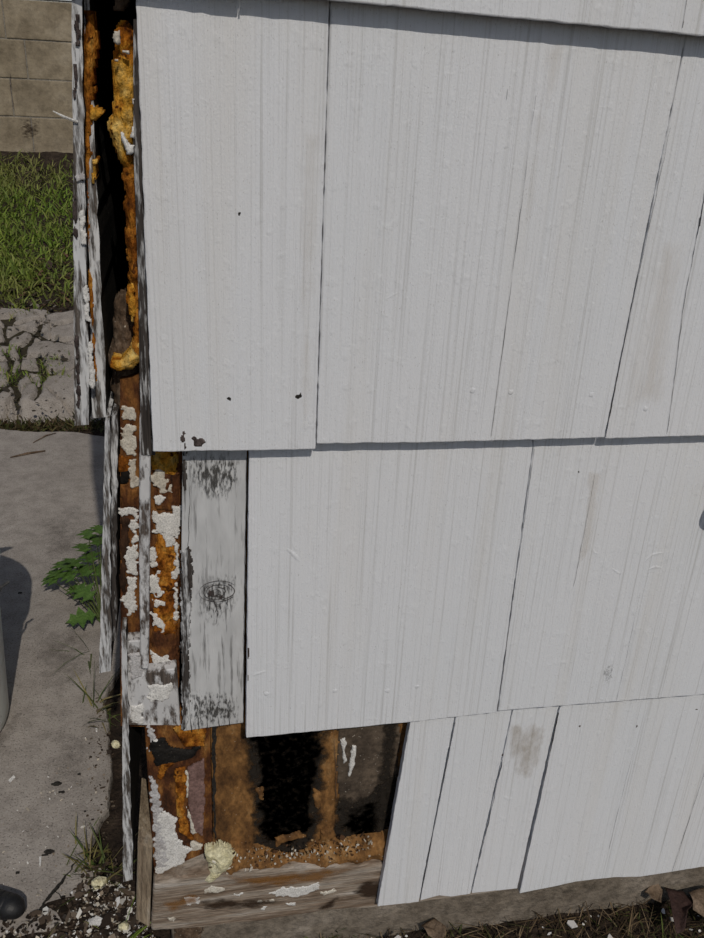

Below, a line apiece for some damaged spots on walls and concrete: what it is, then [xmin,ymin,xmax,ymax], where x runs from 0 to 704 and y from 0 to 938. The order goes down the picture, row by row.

peeling [74,335,96,409]
peeling [120,406,139,488]
leakage [193,457,236,496]
peeling [118,507,139,616]
peeling [150,469,182,633]
leakage [204,579,232,617]
leakage [149,737,201,766]
peeling [149,758,205,874]
leakage [243,731,329,853]
peeling [320,723,401,845]
leakage [334,723,399,839]
peeling [257,882,337,910]